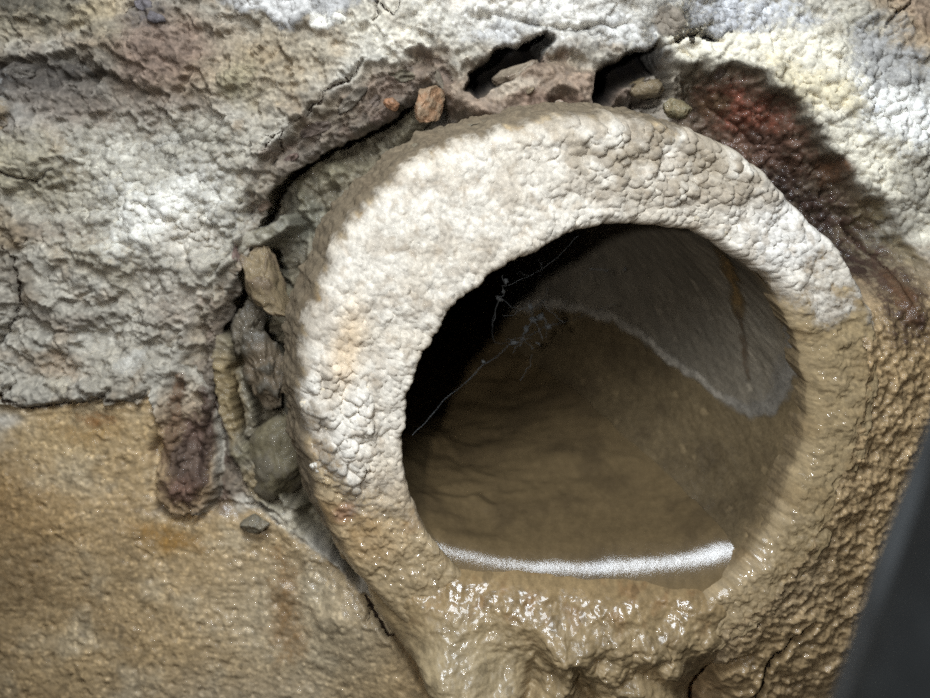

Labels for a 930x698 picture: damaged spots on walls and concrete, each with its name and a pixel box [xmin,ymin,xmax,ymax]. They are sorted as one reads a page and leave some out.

spalling [168,42,631,393]
spalling [610,47,930,277]
rust [692,75,928,345]
crack [0,237,33,343]
crack [0,383,147,409]
water stain [365,569,727,698]
crack [751,637,793,698]